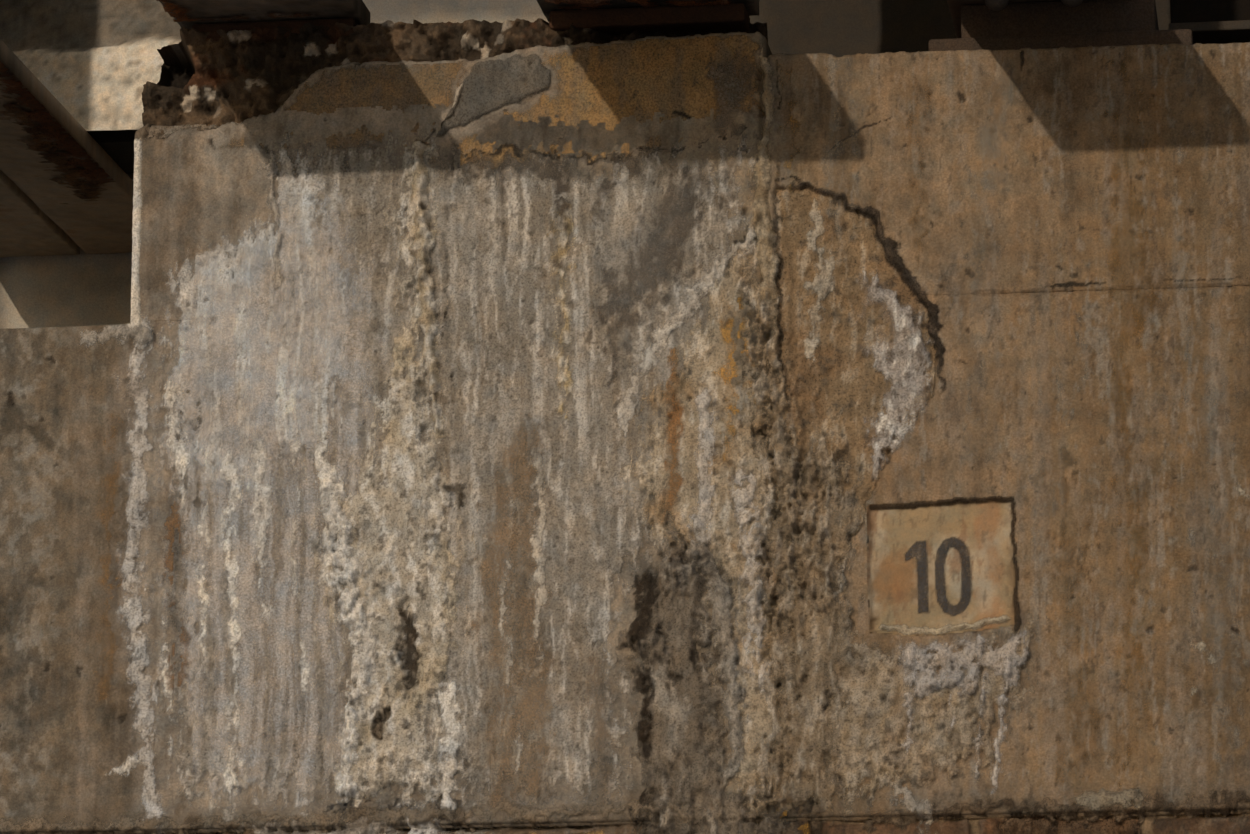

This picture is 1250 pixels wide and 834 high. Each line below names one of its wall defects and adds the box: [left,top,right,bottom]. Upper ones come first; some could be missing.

corrosion [0,61,115,204]
spalling [145,124,221,140]
peeling [425,54,551,141]
water stain [126,139,142,331]
crack [1051,280,1102,288]
spalling [773,182,946,545]
water stain [137,131,1039,834]